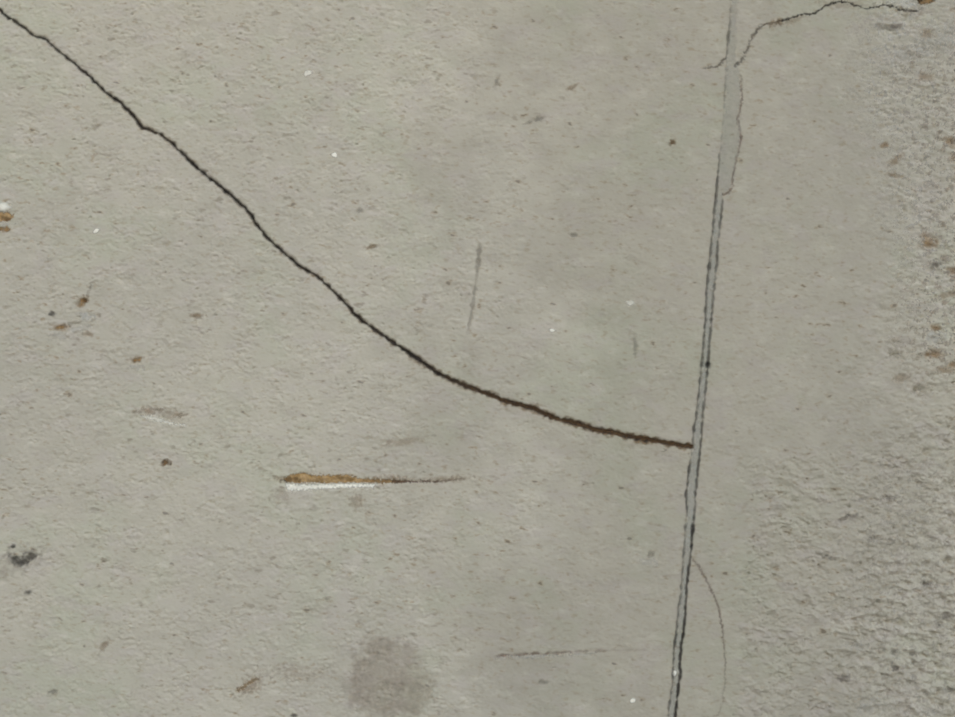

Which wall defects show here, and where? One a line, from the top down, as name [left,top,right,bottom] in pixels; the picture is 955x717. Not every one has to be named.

crack [0,9,700,717]
crack [754,0,917,34]